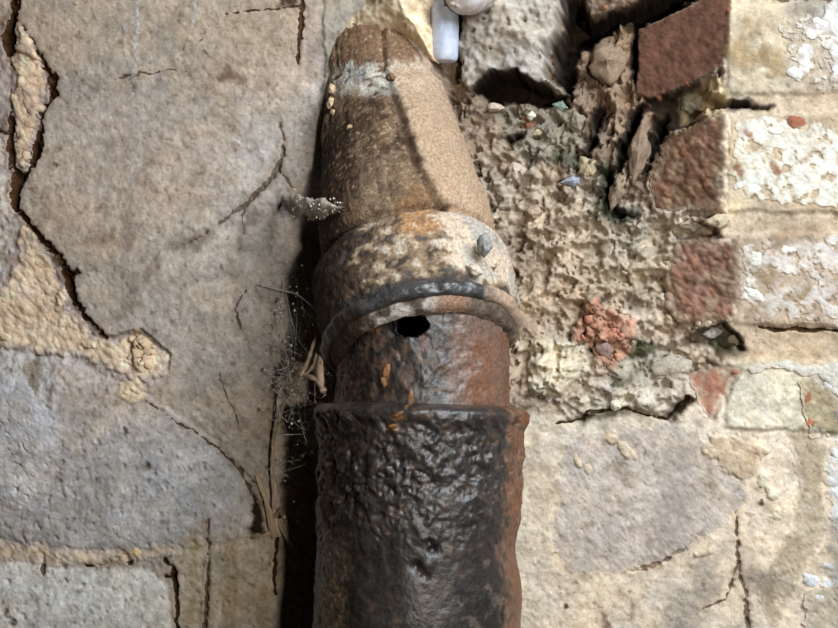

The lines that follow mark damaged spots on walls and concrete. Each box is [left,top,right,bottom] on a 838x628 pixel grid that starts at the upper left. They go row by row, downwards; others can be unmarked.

spalling [590,0,638,20]
spalling [637,0,732,102]
crack [0,0,108,338]
spalling [0,224,171,404]
crack [146,401,264,502]
corrosion [380,364,390,388]
spalling [570,294,639,370]
crack [555,395,691,425]
crack [758,325,838,333]
crack [163,557,180,628]
crack [202,519,211,628]
crack [702,511,751,628]